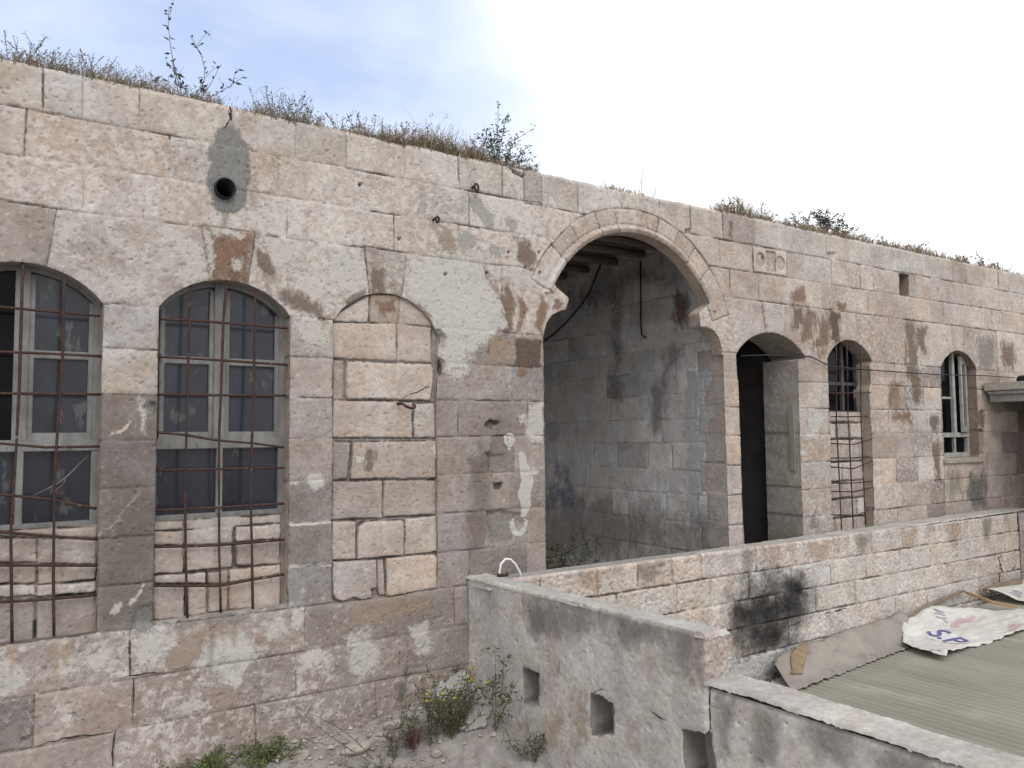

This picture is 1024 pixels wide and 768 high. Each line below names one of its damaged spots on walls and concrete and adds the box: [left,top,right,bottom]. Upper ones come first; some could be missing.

damp [439,226,457,250]
damp [483,266,563,376]
damp [792,286,846,358]
damp [889,323,927,410]
damp [1001,343,1015,370]
peeling [484,403,544,537]
damp [930,415,941,479]